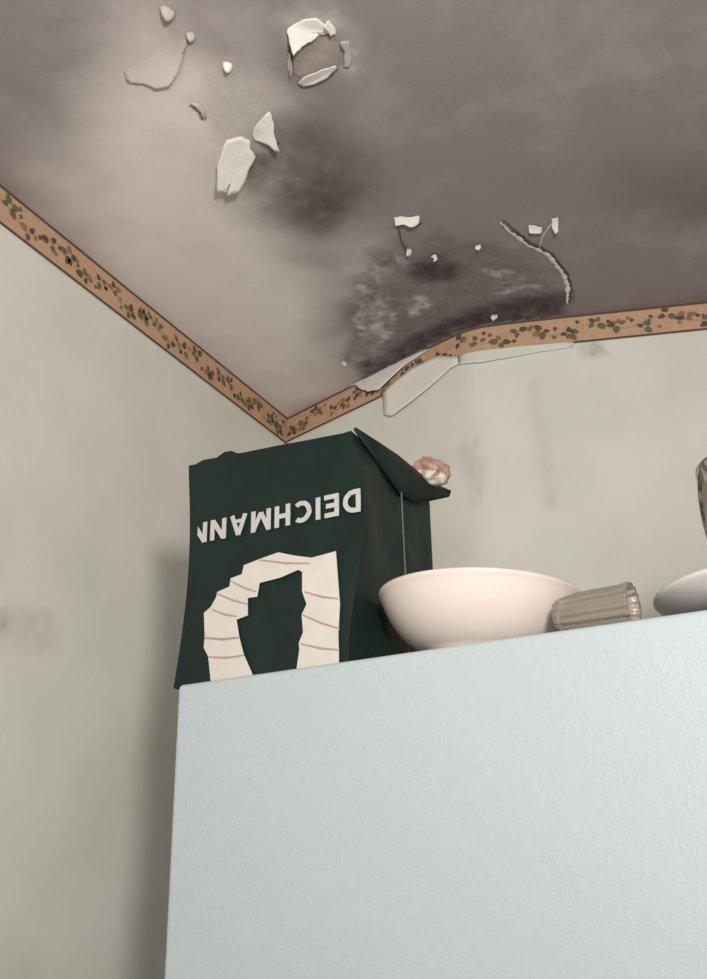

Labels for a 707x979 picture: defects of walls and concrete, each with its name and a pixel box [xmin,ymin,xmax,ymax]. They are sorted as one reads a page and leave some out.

peeling [287,12,355,88]
peeling [213,73,280,196]
peeling [394,216,422,260]
crack [500,218,573,304]
water stain [351,246,563,374]
peeling [349,349,429,392]